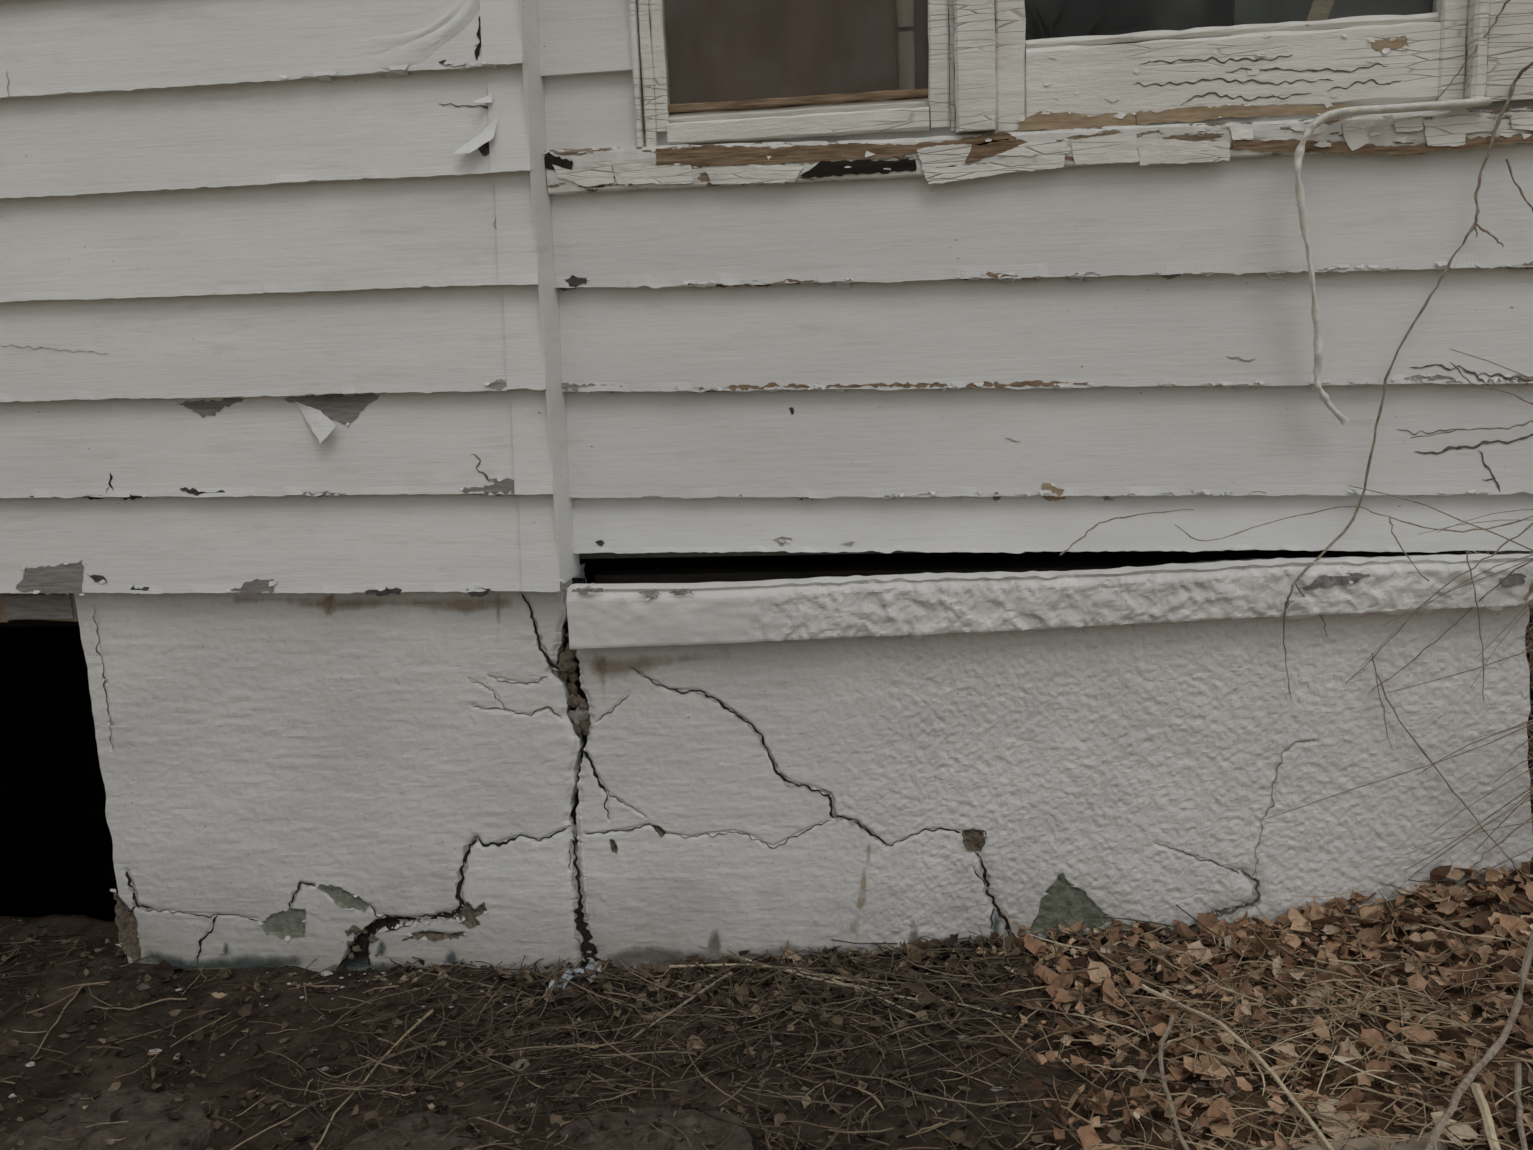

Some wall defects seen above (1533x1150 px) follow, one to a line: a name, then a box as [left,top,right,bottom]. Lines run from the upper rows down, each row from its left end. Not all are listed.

peeling [1368,36,1409,54]
crack [1041,33,1401,115]
peeling [544,97,1533,425]
peeling [170,398,249,418]
peeling [274,393,380,443]
peeling [460,454,516,496]
peeling [16,559,107,596]
crack [572,577,586,585]
crack [370,593,1016,962]
crack [124,871,315,962]